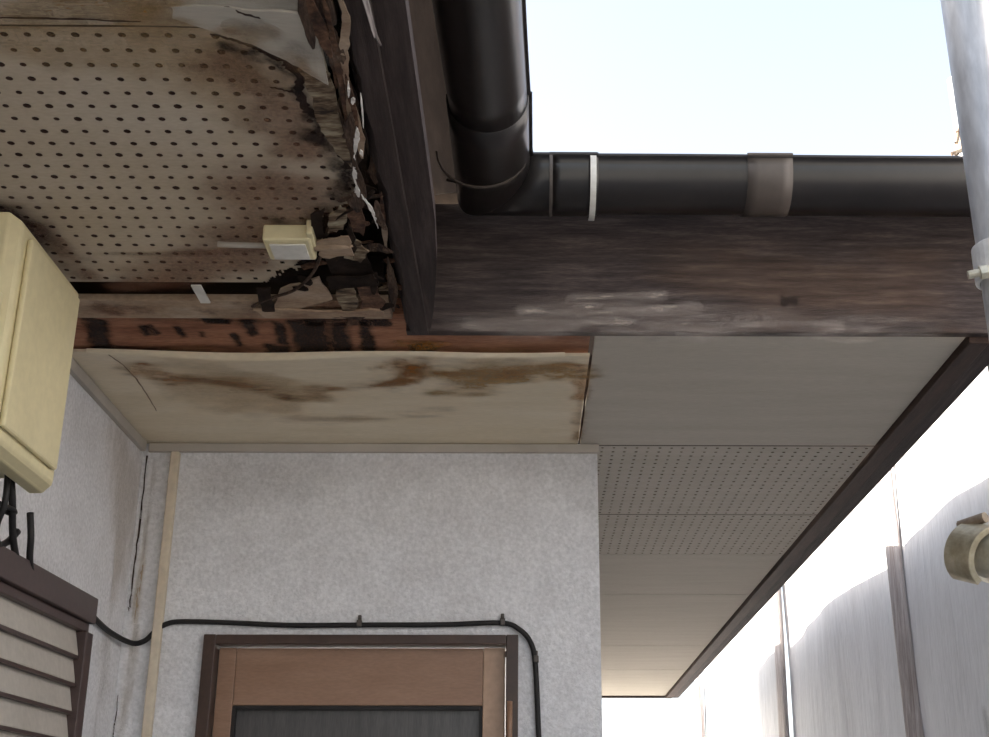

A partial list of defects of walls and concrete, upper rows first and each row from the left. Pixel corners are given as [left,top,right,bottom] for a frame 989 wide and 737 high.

peeling [362,0,382,46]
peeling [324,81,378,227]
peeling [292,260,338,291]
damp [81,305,175,351]
damp [174,300,392,353]
damp [369,366,424,387]